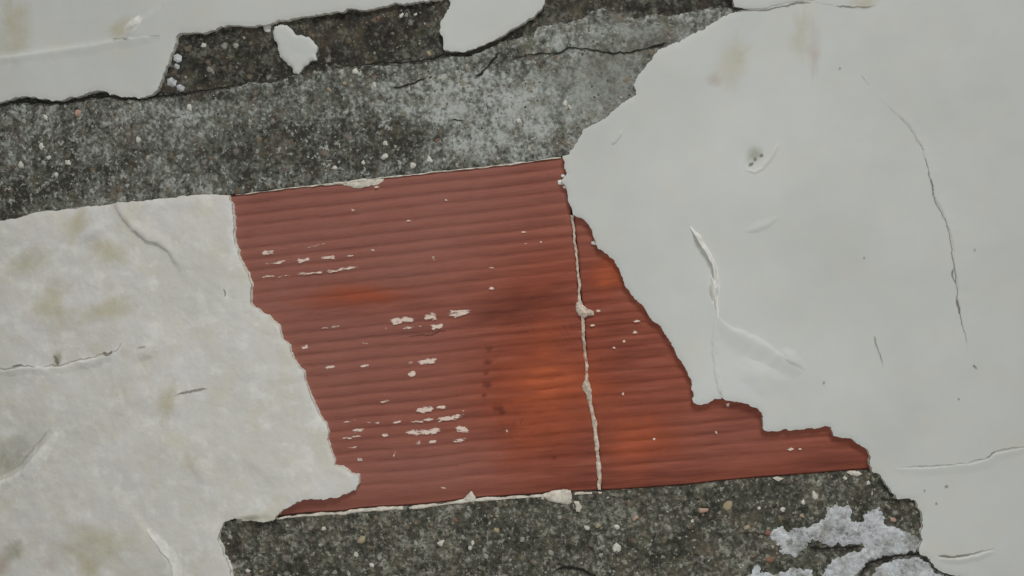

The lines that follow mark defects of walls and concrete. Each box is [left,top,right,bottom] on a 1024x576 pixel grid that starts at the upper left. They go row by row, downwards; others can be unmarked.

spalling [0,0,451,104]
crack [352,35,665,88]
crack [896,108,971,340]
crack [0,348,122,377]
spalling [230,195,361,497]